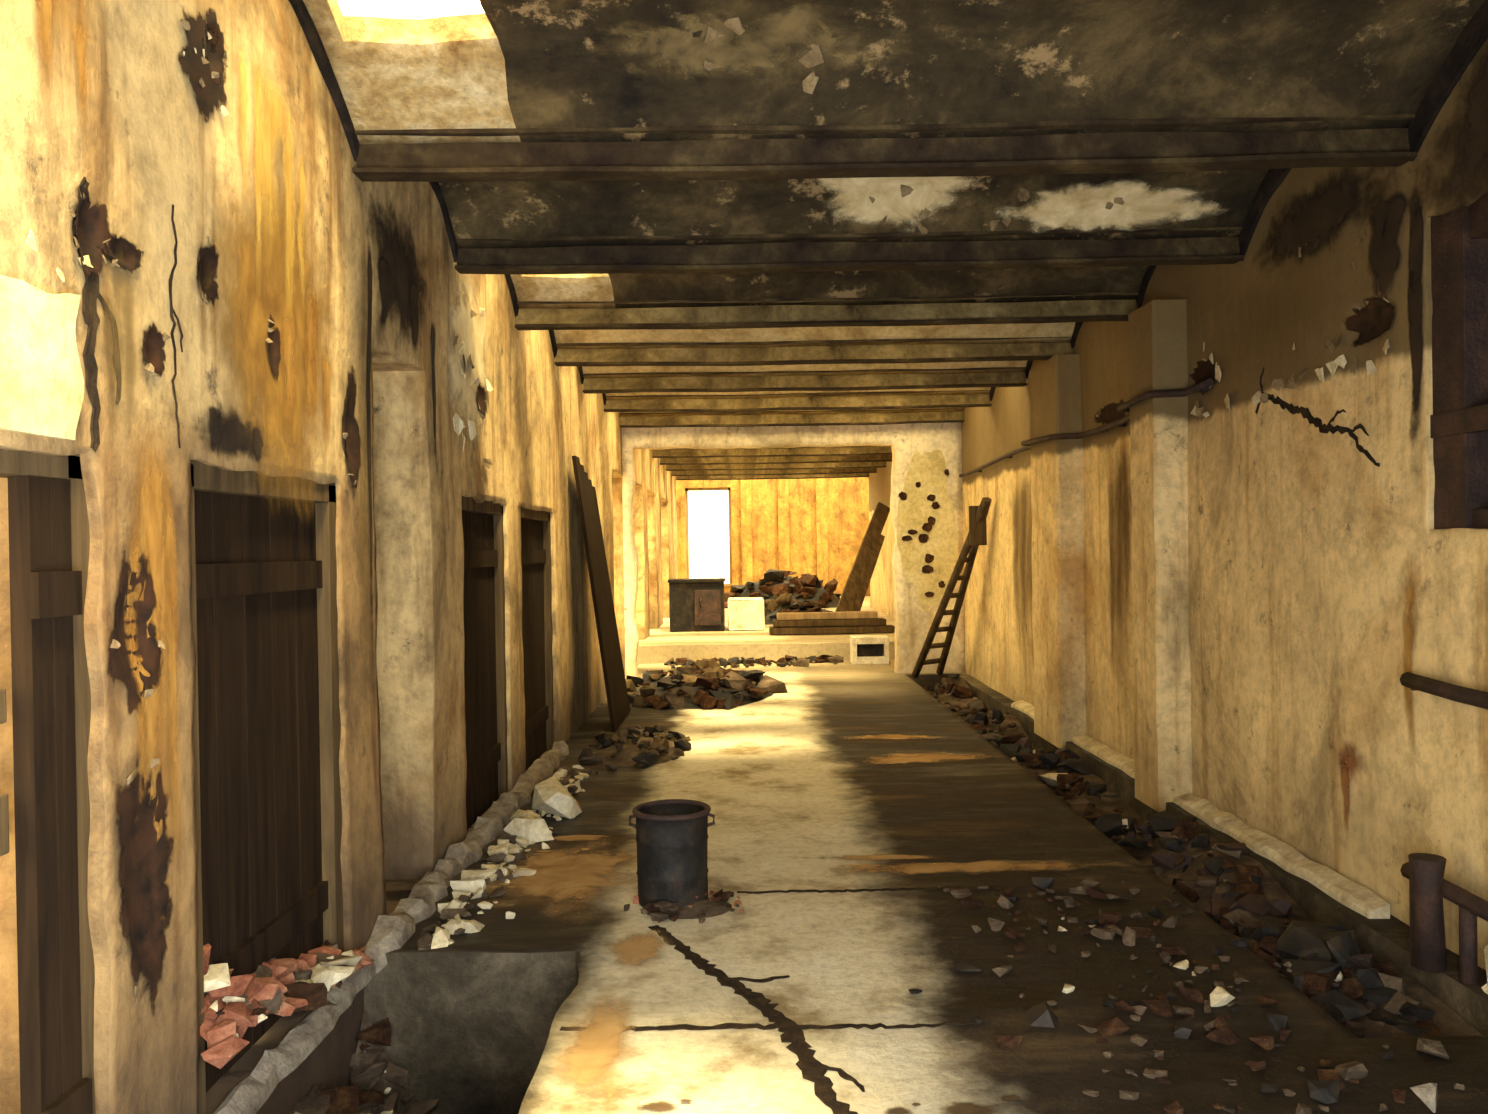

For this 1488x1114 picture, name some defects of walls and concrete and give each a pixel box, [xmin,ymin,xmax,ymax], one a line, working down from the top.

spalling [178,8,229,123]
flaking render [817,176,985,234]
flaking render [990,181,1219,232]
flaking render [0,268,84,440]
crack [169,204,183,448]
crack [1255,367,1380,467]
flaking render [897,450,959,612]
spalling [107,548,166,715]
rust [1339,745,1359,824]
spalling [116,754,174,1016]
crack [559,1024,584,1032]
crack [625,925,974,1114]